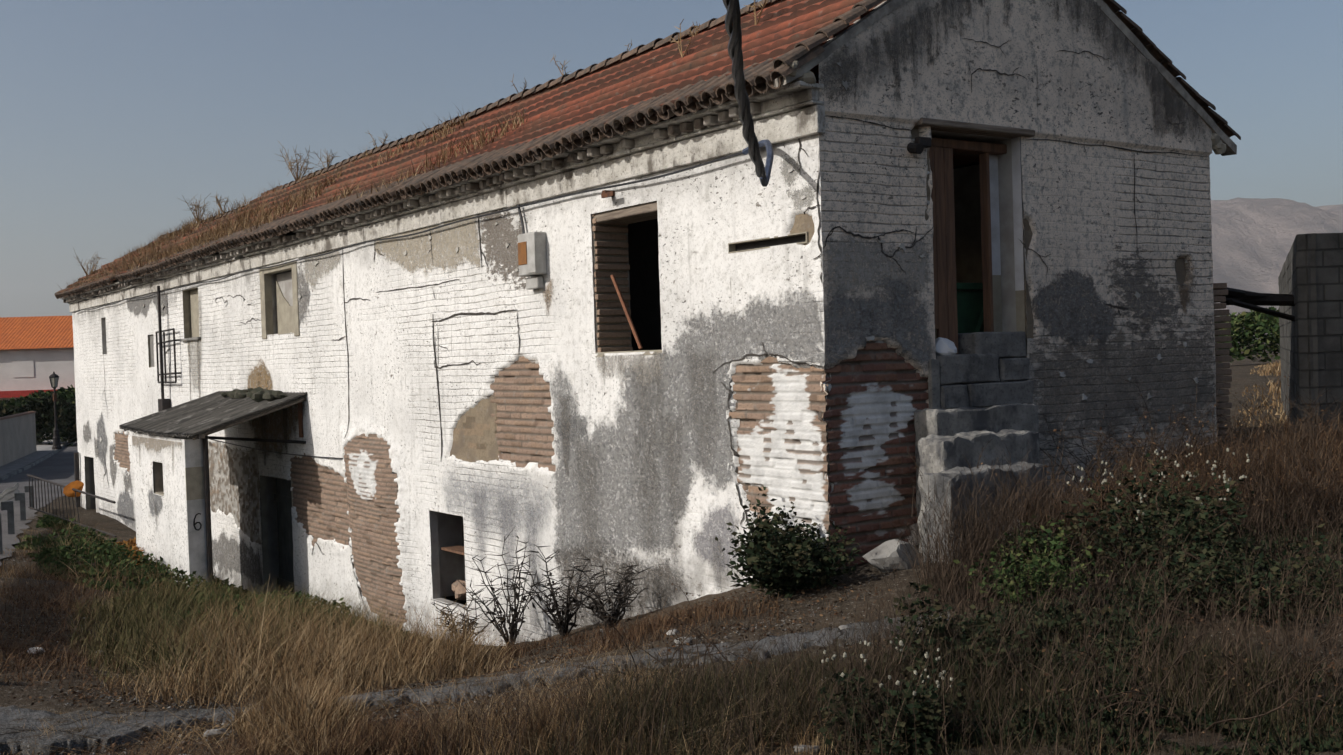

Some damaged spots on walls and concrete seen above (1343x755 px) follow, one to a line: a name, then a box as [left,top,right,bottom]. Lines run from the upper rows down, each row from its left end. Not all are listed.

water stain [852,0,1010,95]
crack [963,38,1025,93]
water stain [1056,0,1198,136]
flaking render [375,206,530,294]
spalling [781,158,817,245]
crack [798,138,933,282]
water stain [1031,270,1116,346]
flaking render [208,442,263,587]
flaking render [290,453,350,549]
flaking render [449,356,556,472]
water stain [448,278,936,630]
flaking render [729,336,929,571]